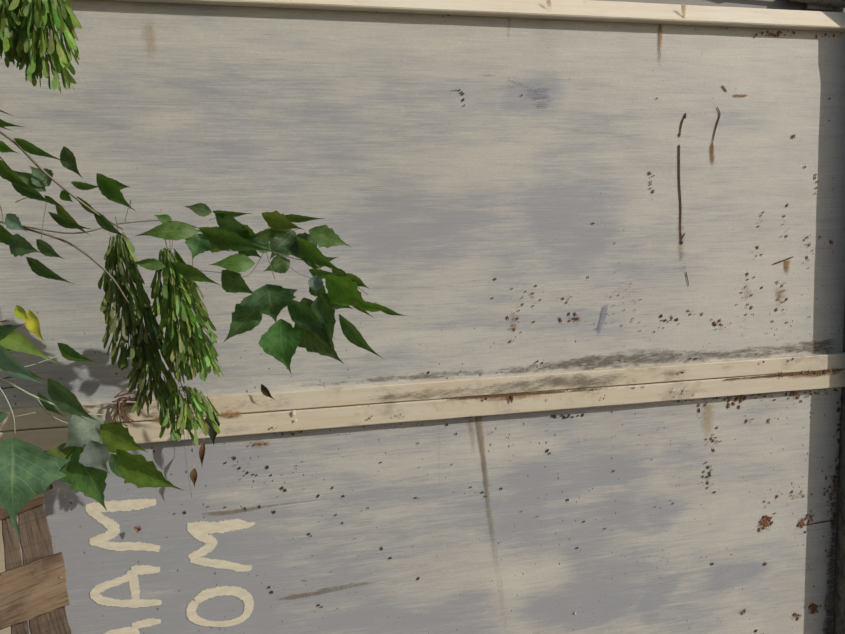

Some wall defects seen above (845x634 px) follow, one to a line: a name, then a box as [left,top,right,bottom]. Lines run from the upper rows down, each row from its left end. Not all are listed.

damp [494,340,833,394]
damp [476,416,489,497]
rust [753,494,779,532]